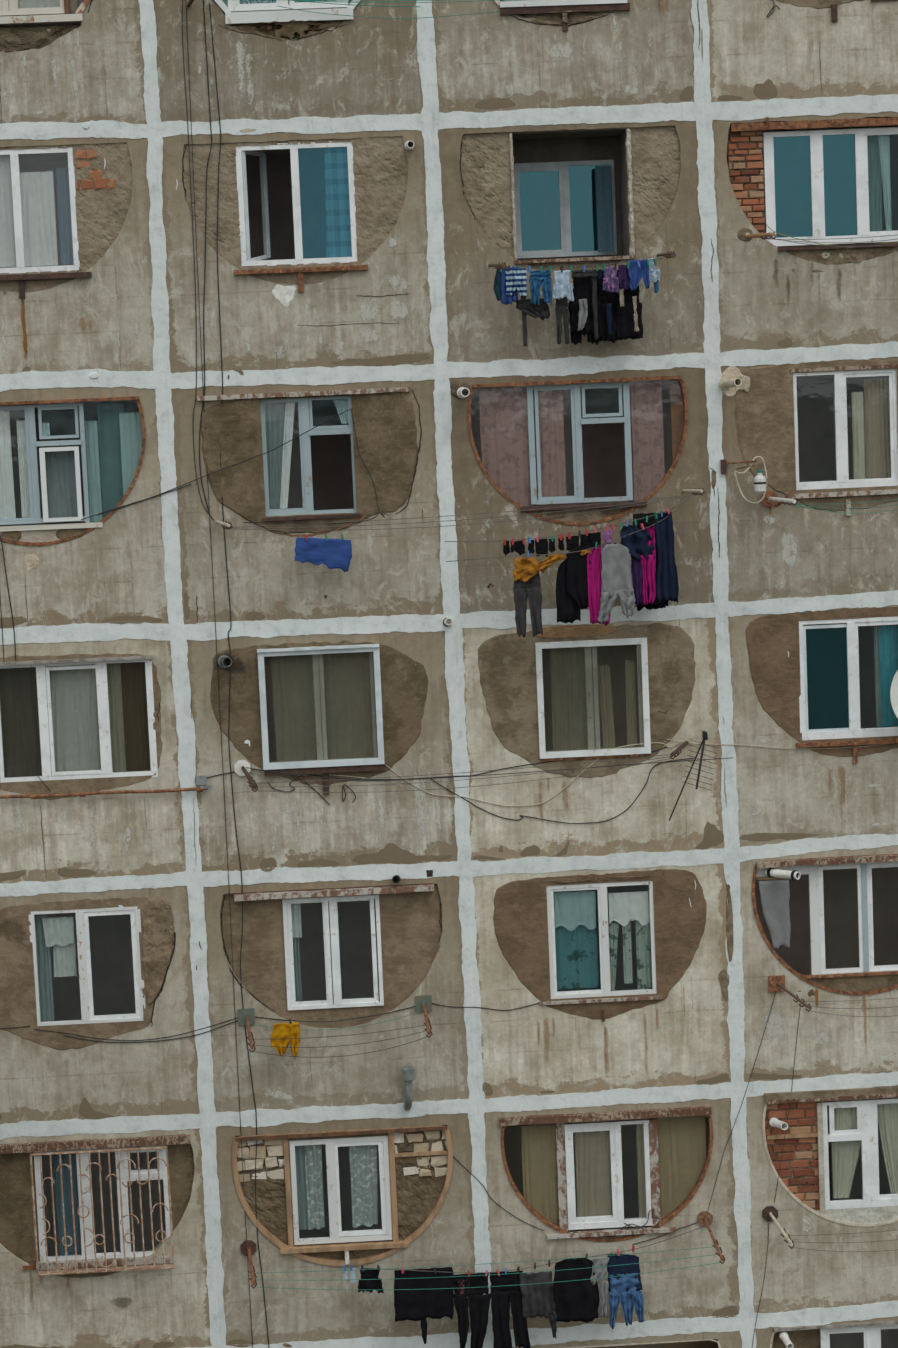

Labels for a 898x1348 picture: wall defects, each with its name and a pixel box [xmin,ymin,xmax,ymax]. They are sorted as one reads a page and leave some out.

flaking render [75,149,115,190]